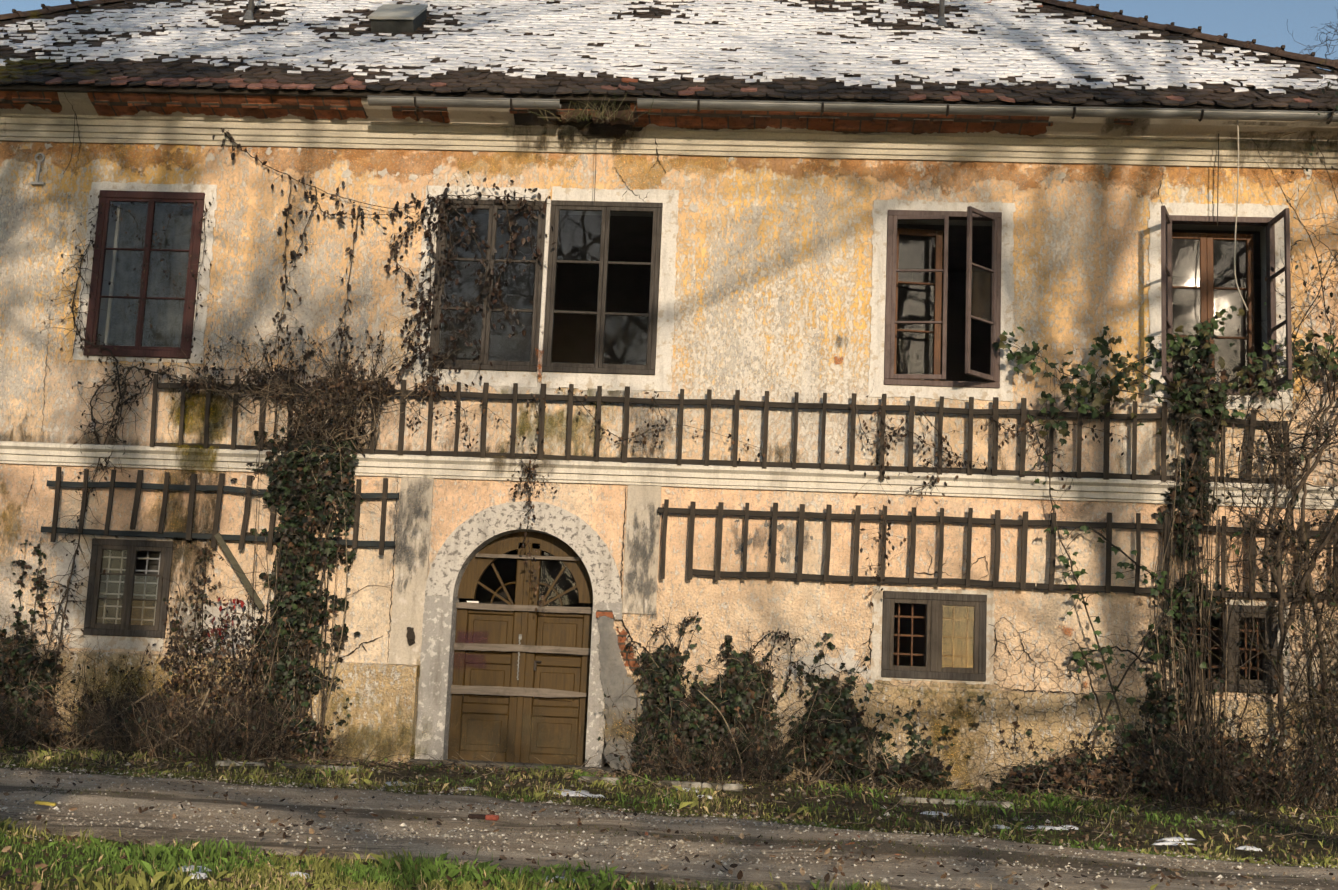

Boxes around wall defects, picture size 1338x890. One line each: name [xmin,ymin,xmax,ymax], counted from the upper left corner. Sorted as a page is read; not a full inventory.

spalling [0,91,62,113]
spalling [87,92,368,120]
spalling [391,106,450,123]
spalling [462,102,1053,190]
peeling [1245,169,1338,187]
peeling [0,143,215,417]
peeling [676,158,1166,416]
leakage [390,482,429,584]
leakage [626,506,657,617]
spalling [596,610,657,675]